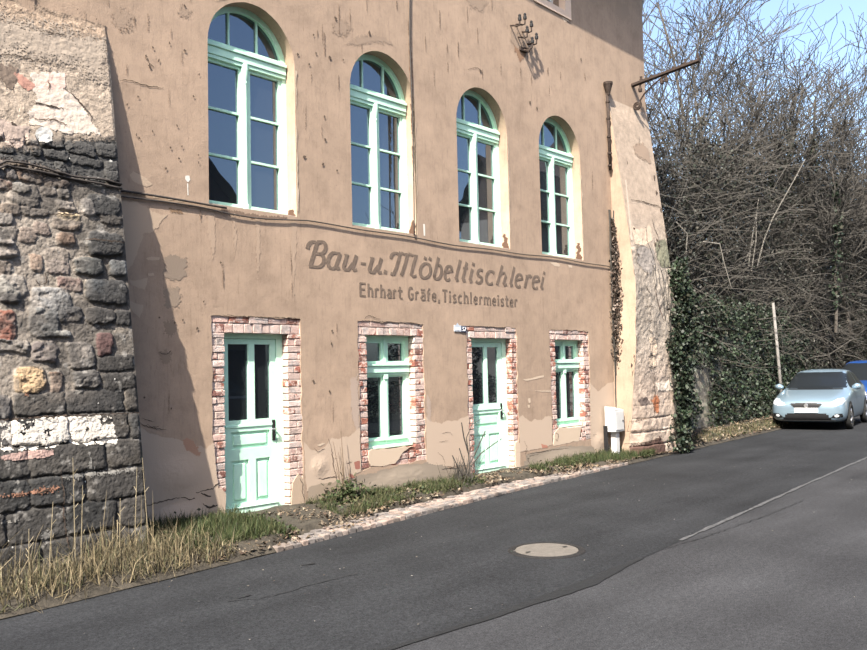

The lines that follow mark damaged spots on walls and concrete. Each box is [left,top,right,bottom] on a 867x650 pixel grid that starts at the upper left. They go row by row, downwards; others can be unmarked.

spalling [0,69,100,148]
peeling [0,415,118,461]
peeling [140,428,226,516]
crack [147,482,224,509]
peeling [291,428,413,505]
peeling [426,416,470,476]
peeling [514,375,615,467]